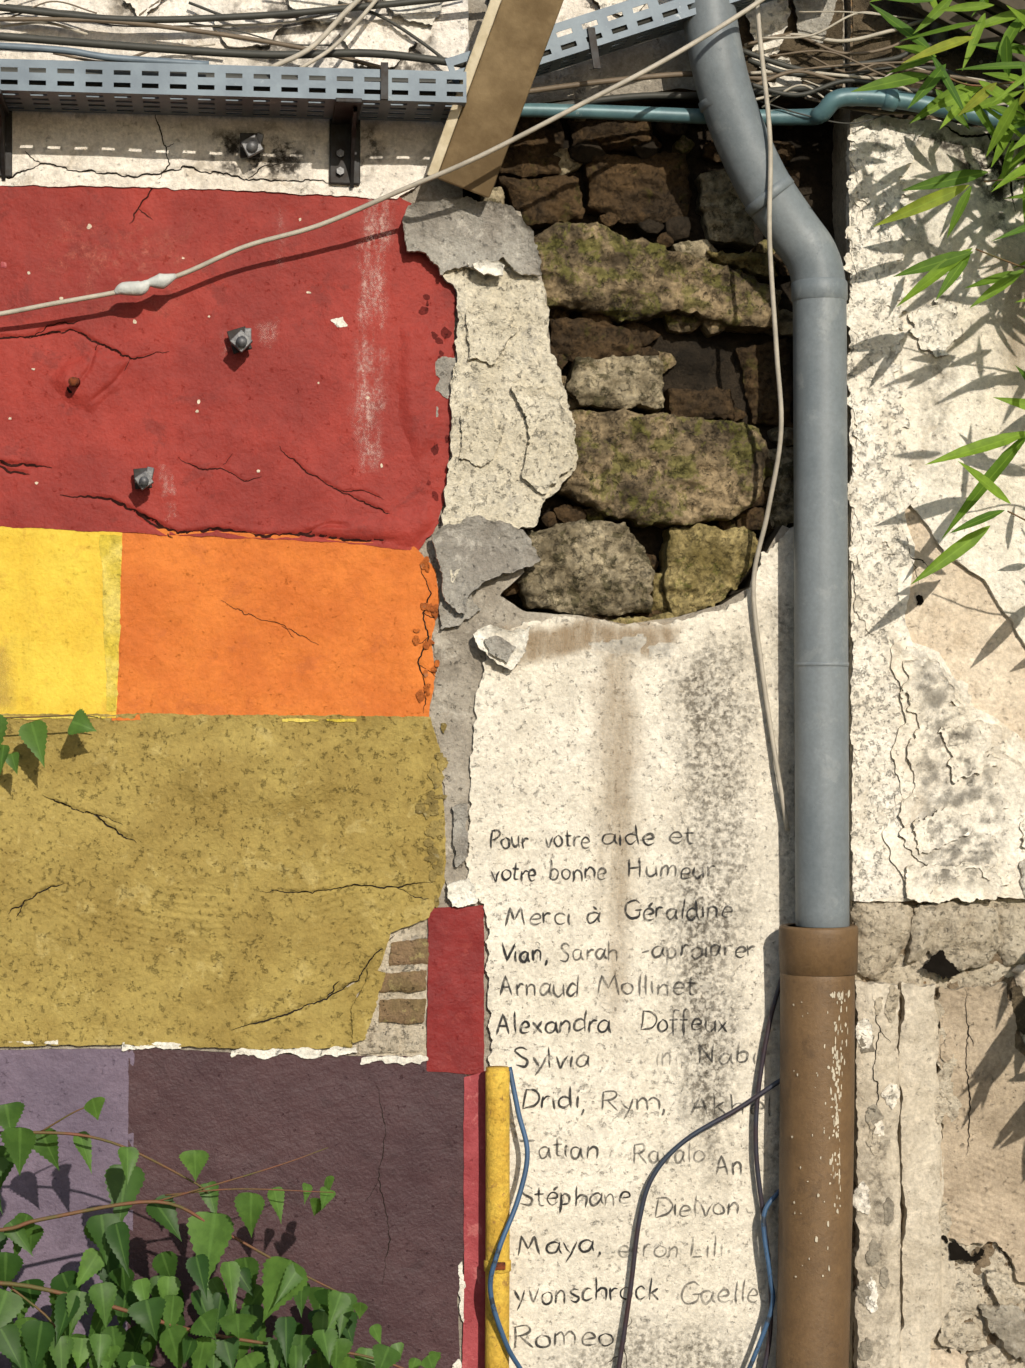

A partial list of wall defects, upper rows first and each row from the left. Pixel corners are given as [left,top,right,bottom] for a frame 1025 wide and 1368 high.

crack [6,115,326,224]
crack [0,321,169,371]
crack [0,447,389,542]
flaking render [230,102,794,1065]
peeling [737,0,1025,1250]
crack [43,795,136,842]
water stain [686,661,737,949]
crack [260,881,435,900]
crack [233,935,395,1030]
peeling [122,1042,181,1051]
peeling [855,1239,901,1313]
flaking render [930,1201,1025,1368]